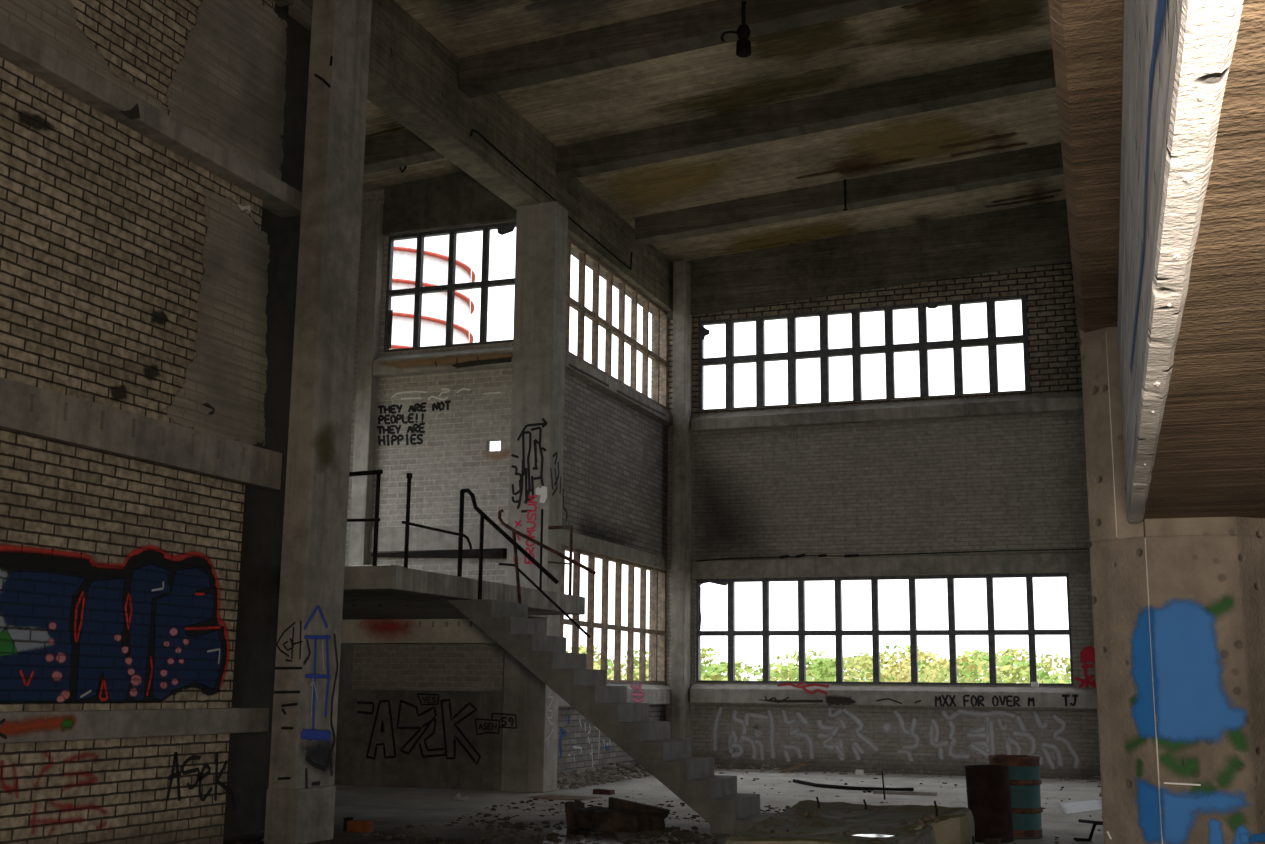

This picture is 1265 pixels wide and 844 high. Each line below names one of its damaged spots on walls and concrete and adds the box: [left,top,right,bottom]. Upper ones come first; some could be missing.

spalling [18,111,54,130]
spalling [144,365,161,381]
spalling [111,385,127,401]